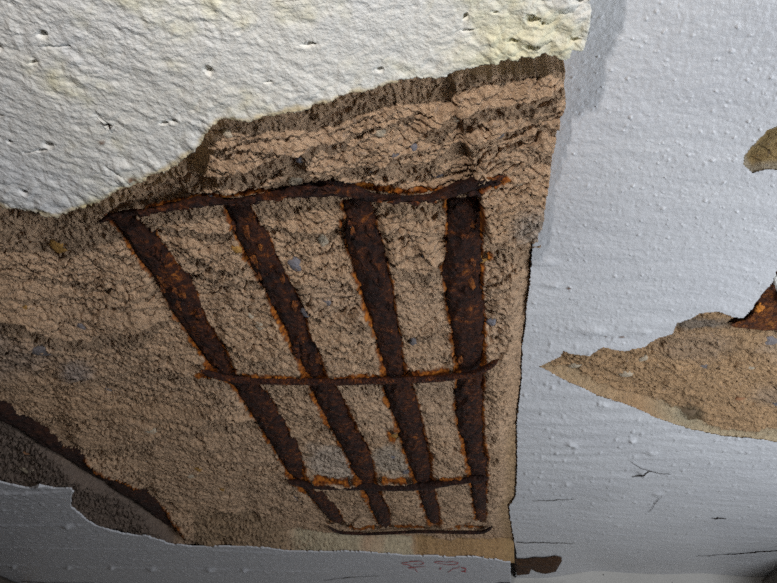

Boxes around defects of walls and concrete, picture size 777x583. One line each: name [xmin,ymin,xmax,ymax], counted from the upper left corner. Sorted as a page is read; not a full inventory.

spalling [743,126,777,173]
rust [461,176,511,300]
spalling [0,53,566,563]
rust [104,182,490,531]
spalling [539,310,777,442]